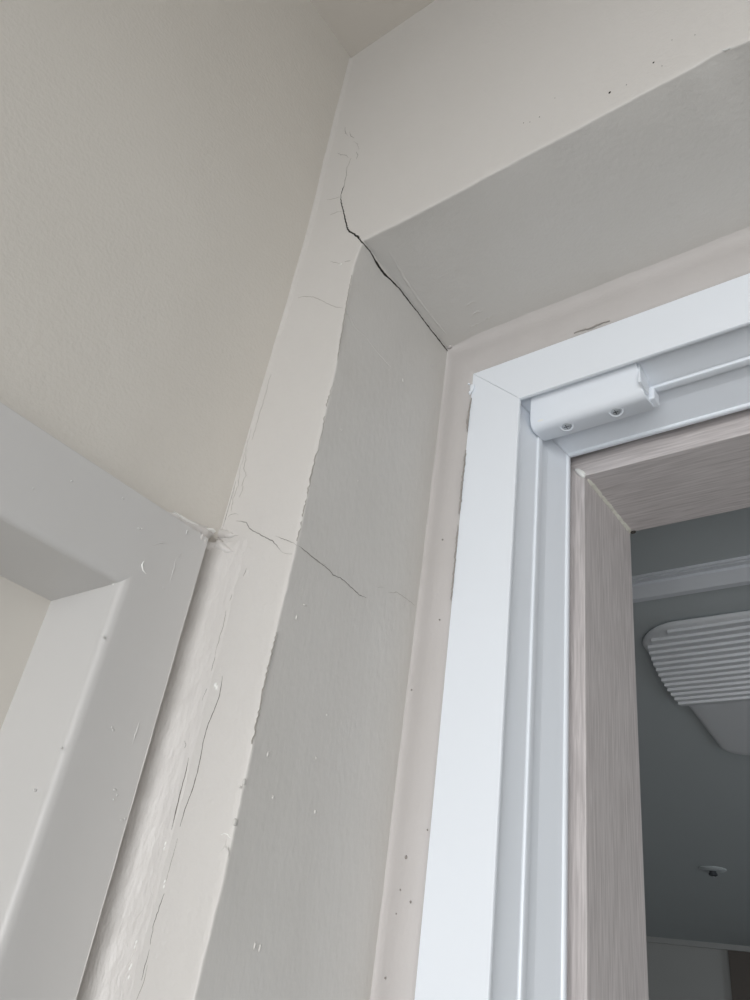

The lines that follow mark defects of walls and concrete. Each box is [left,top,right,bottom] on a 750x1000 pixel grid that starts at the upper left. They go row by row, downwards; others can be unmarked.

crack [328,132,453,351]
crack [223,376,414,605]
crack [137,612,226,998]